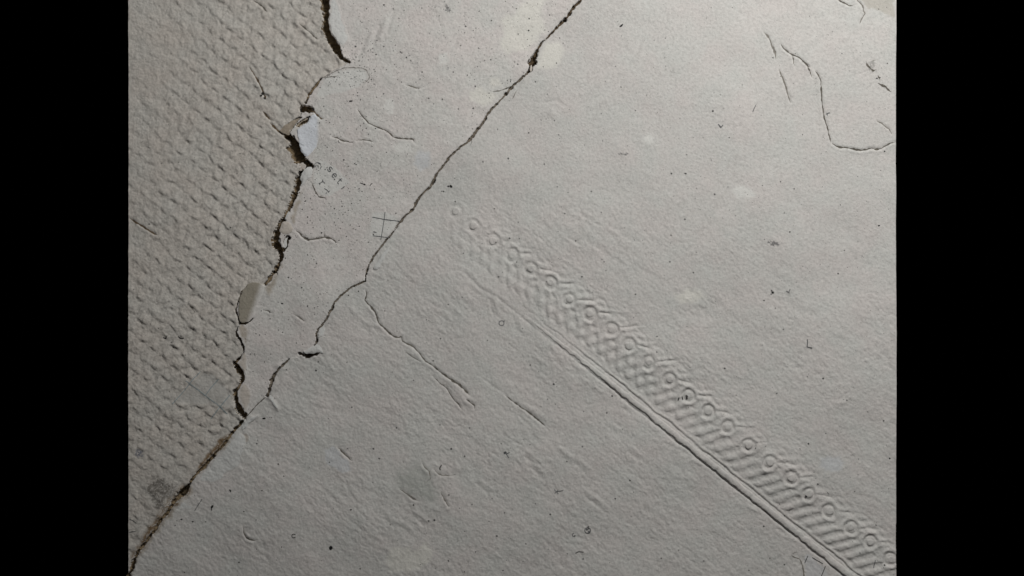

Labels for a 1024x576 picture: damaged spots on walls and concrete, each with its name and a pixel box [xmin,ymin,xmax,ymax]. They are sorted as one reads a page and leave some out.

peeling [297,114,322,186]
crack [765,33,894,151]
peeling [238,282,264,323]
crack [126,0,582,576]